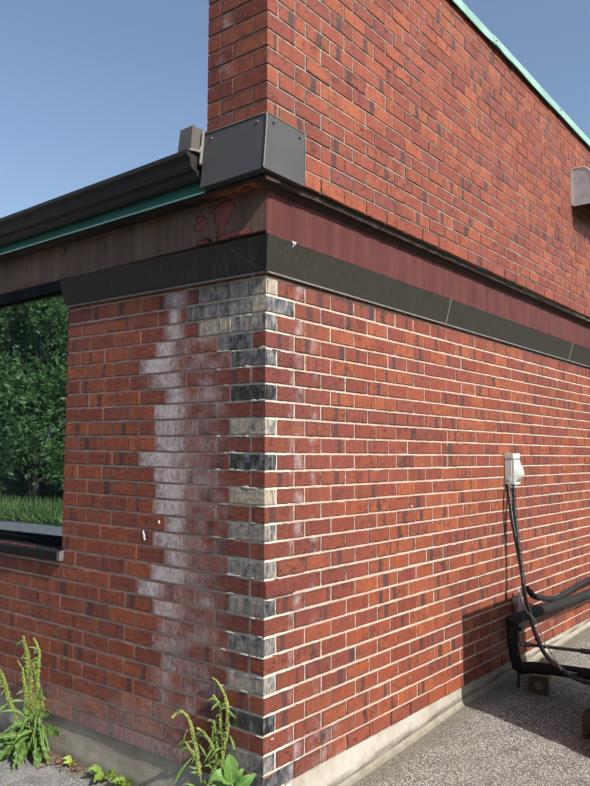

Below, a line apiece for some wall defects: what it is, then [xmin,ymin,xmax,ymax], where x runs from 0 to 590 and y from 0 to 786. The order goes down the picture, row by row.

peeling [193,199,252,246]
water stain [140,295,184,618]